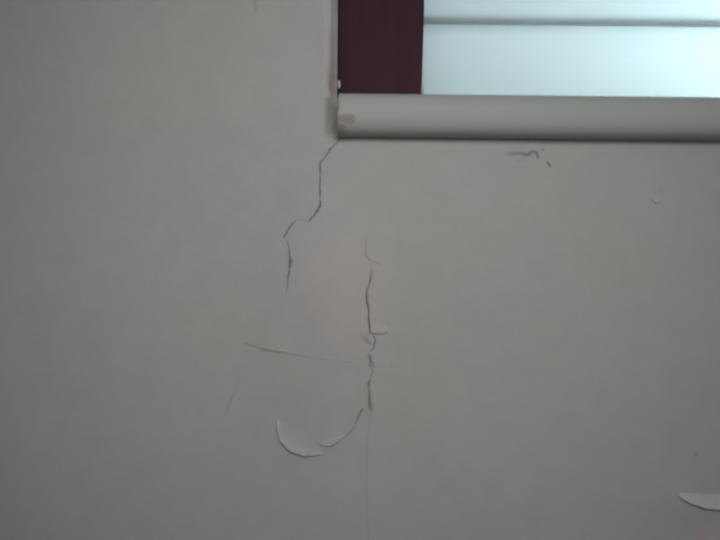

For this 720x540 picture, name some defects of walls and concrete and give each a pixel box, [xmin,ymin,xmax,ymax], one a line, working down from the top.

crack [282,141,340,294]
crack [243,233,388,540]
peeling [678,493,720,510]